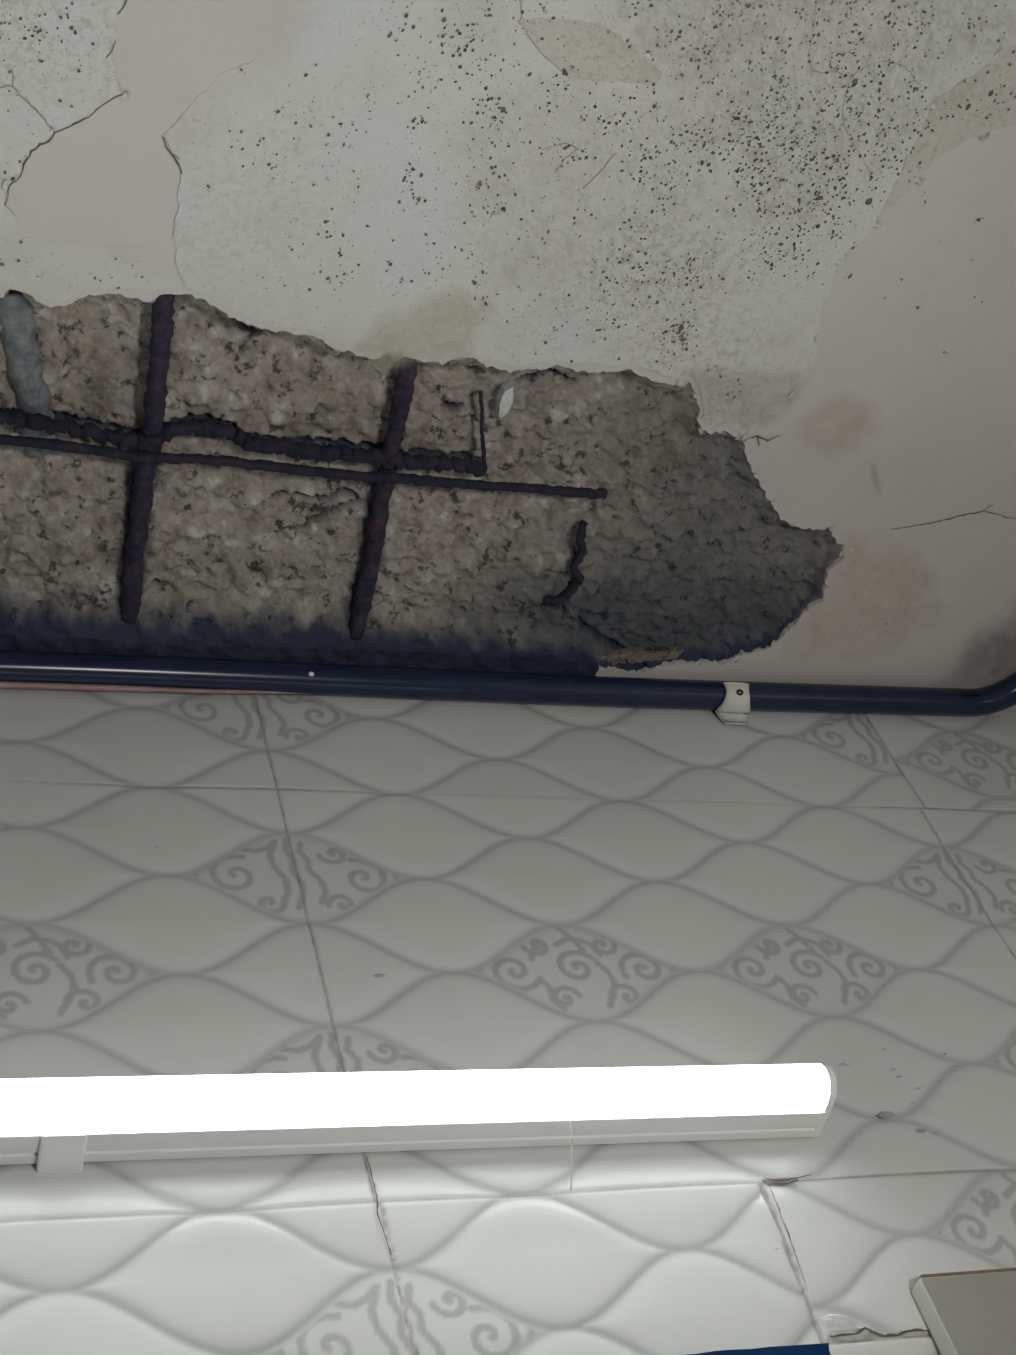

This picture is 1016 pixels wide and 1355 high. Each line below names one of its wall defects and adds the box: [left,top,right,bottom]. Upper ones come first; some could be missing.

water stain [0,0,77,63]
crack [0,68,123,205]
water stain [228,94,379,213]
water stain [378,0,1016,370]
water stain [305,207,500,320]
peeling [0,0,1016,676]
crack [891,505,1014,530]
crack [366,1156,392,1255]